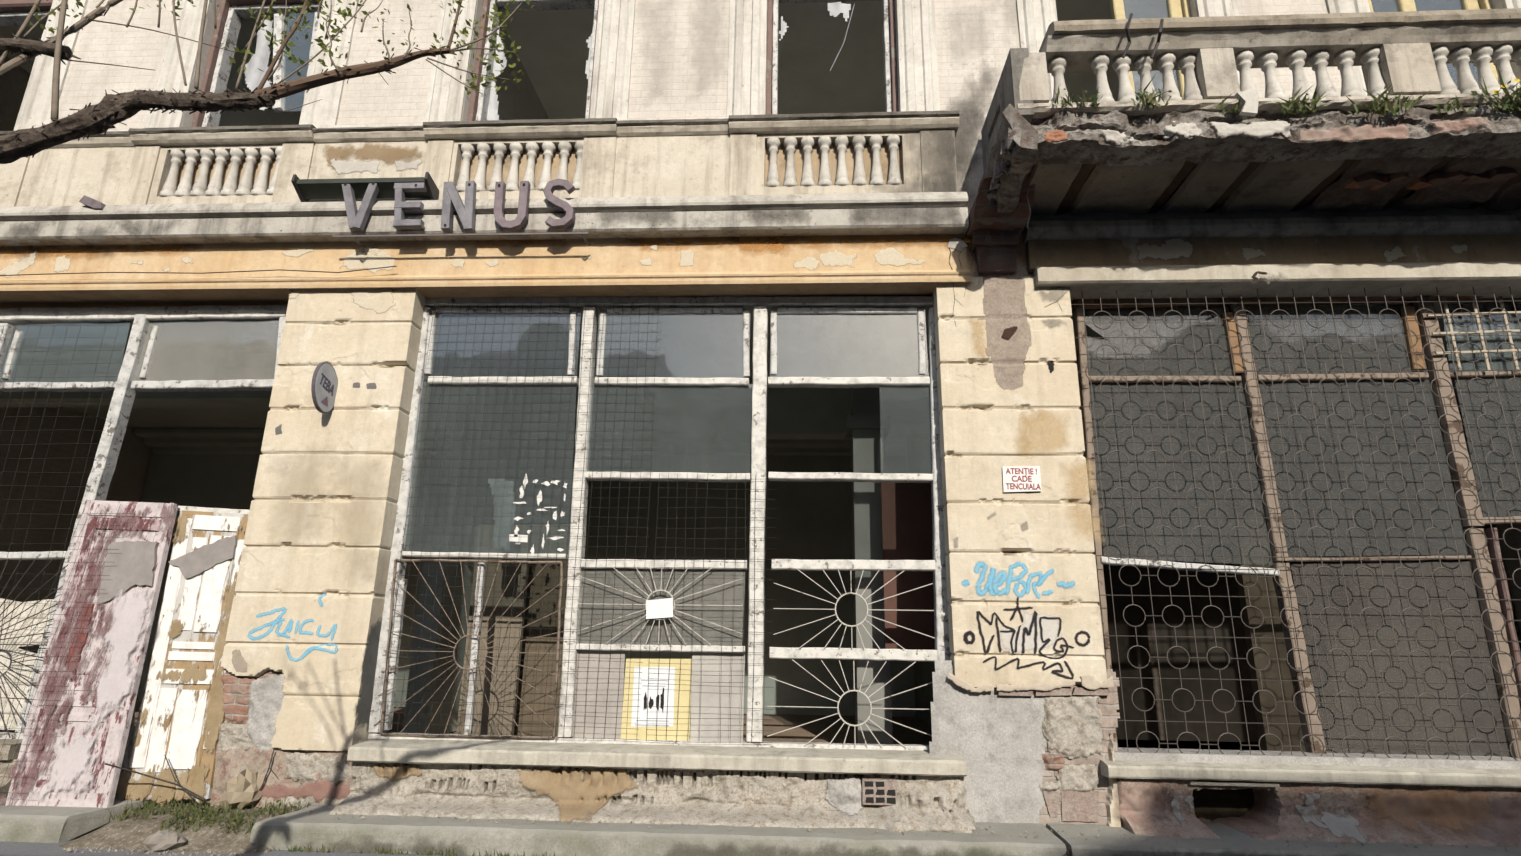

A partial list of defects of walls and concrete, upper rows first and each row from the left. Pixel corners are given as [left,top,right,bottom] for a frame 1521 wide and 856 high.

flaking render [1045,130,1068,142]
flaking render [1101,129,1134,144]
flaking render [1164,121,1409,141]
flaking render [1431,117,1490,134]
flaking render [331,158,422,174]
flaking render [1344,168,1517,190]
peeling [793,247,925,270]
peeling [948,238,1032,390]
flaking render [201,650,366,809]
flaking render [929,660,1194,828]
flaking render [373,764,422,781]
flaking render [517,767,638,822]